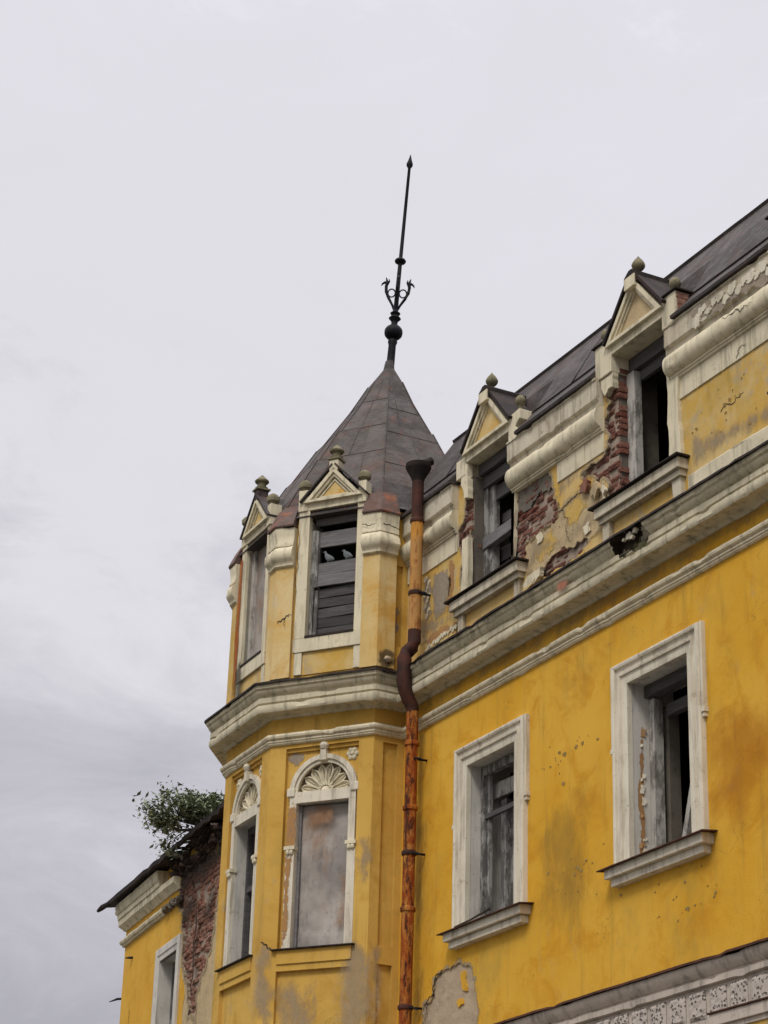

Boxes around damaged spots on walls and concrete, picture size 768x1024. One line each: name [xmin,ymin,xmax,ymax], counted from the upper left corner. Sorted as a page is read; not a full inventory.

peeling [676,257,768,329]
crack [277,530,300,627]
flaking render [423,493,482,652]
flaking render [515,368,630,591]
flaking render [622,527,639,542]
peeling [638,728,648,853]
flaking render [177,830,222,1024]
flaking render [420,958,479,1024]